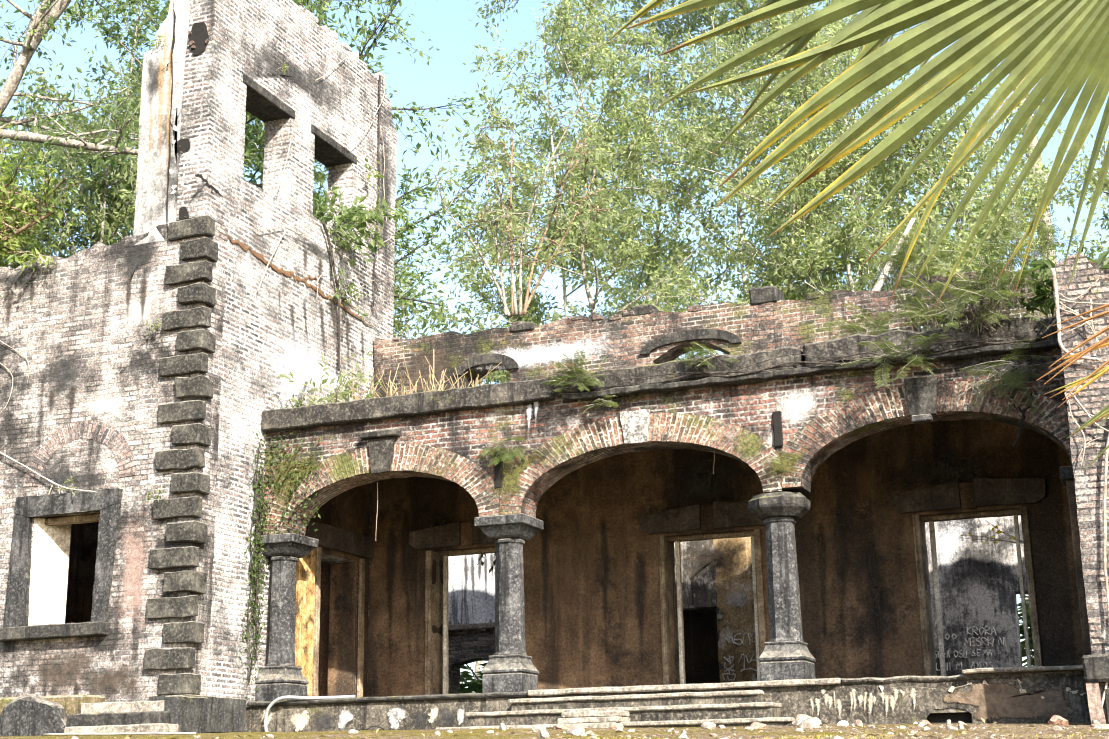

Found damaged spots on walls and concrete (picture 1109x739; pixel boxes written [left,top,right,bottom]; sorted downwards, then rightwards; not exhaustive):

crack [161,4,223,218]
leakage [301,239,332,286]
leakage [44,348,122,417]
leakage [48,466,101,493]
leakage [387,516,411,645]
leakage [541,511,549,625]
leakage [635,556,646,644]
leakage [818,502,847,632]
leakage [954,537,1010,584]
spalling [943,679,1085,720]